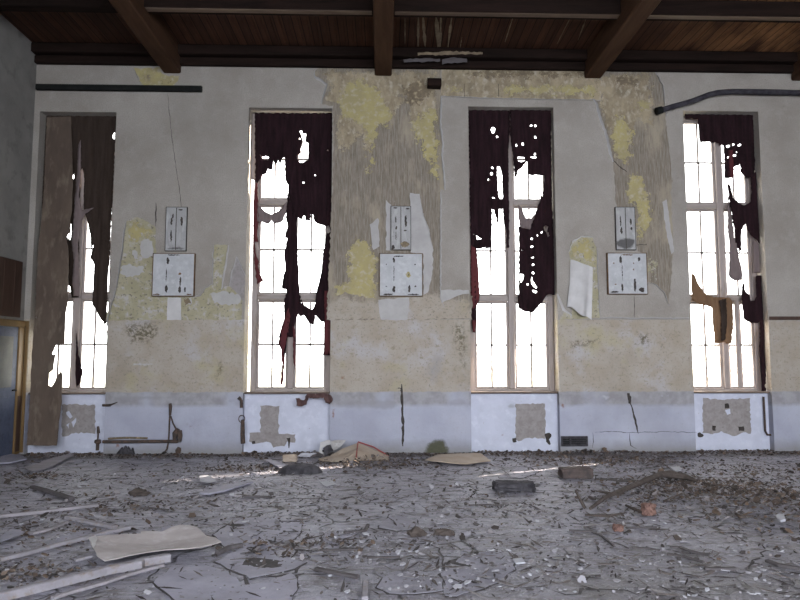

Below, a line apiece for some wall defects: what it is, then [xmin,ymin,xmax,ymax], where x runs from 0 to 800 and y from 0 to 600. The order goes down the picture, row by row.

peeling [314,68,674,320]
peeling [105,217,246,338]
flaking render [61,404,96,437]
flaking render [249,405,296,448]
flaking render [512,403,551,445]
crack [592,393,696,449]
flaking render [698,398,751,437]